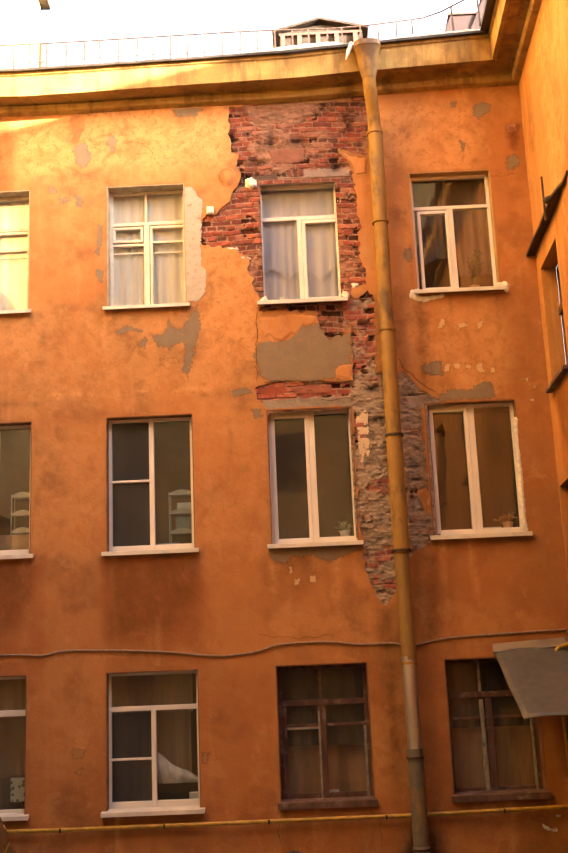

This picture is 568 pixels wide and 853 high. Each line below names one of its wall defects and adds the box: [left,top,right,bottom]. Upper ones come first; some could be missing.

flaking render [115,96,397,606]
spalling [397,361,495,559]